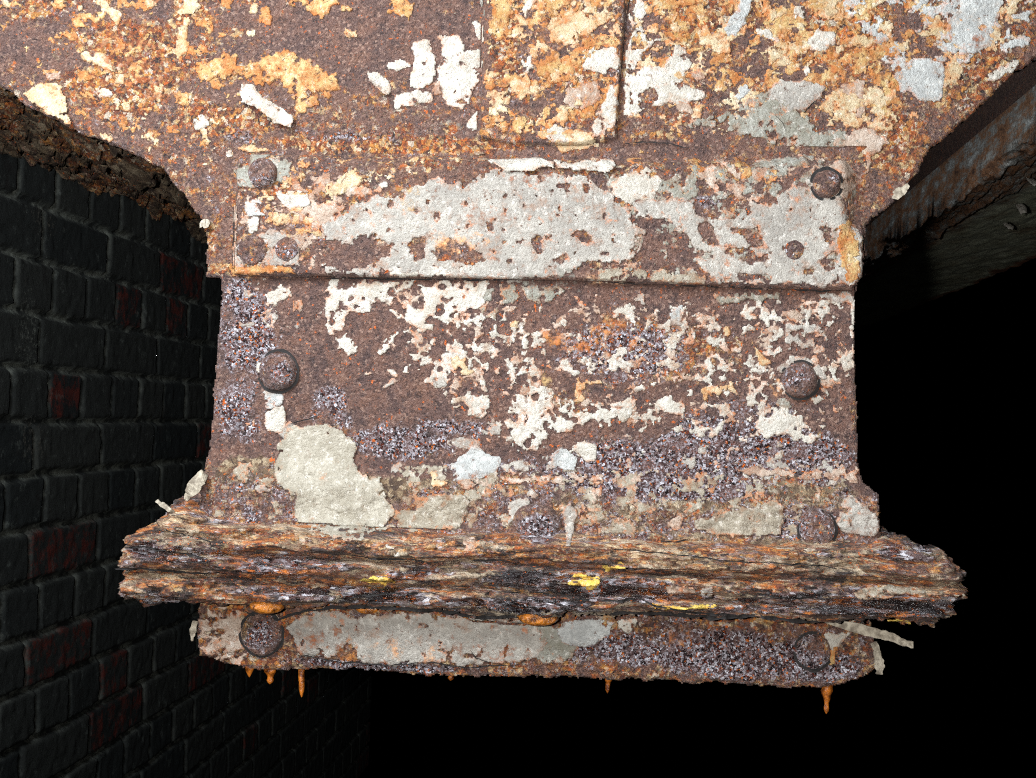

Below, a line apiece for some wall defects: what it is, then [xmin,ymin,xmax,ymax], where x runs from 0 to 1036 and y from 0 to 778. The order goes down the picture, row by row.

peeling [0,0,30,19]
rust [892,183,910,200]
peeling [10,0,1036,554]
rust [543,320,624,350]
rust [155,499,175,513]
peeling [853,580,966,600]
rust [189,620,198,641]
peeling [286,610,637,668]
rust [824,621,913,675]
rust [245,667,277,684]
rust [821,685,833,714]